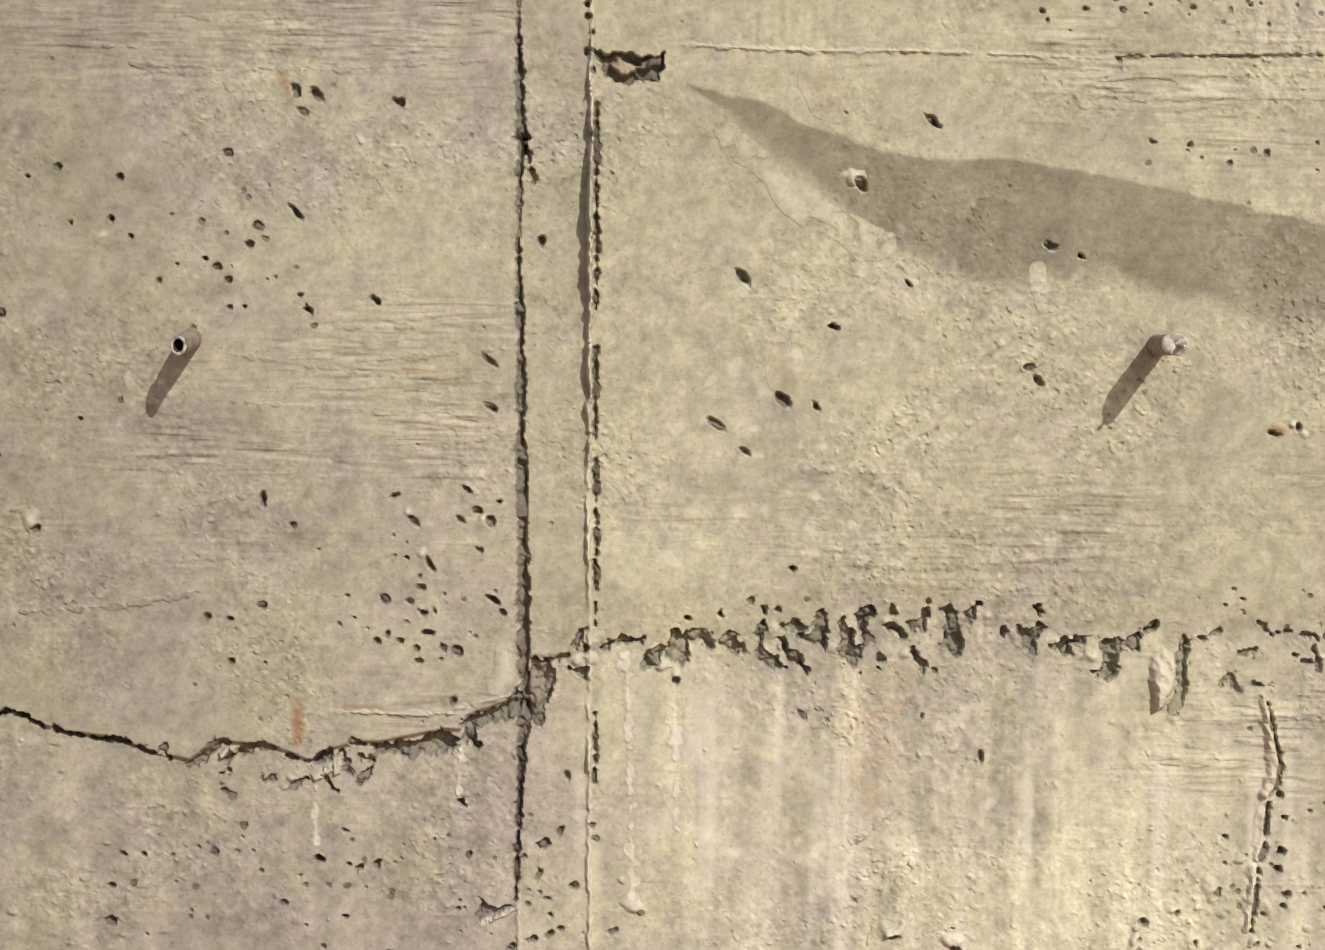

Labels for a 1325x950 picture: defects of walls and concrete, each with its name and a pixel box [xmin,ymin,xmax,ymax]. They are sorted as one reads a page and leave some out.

spalling [583,47,666,440]
spalling [406,515,421,529]
spalling [454,484,497,529]
spalling [373,555,464,666]
spalling [1216,618,1325,698]
spalling [156,595,1223,802]
crack [0,706,158,756]
spalling [534,825,566,851]
spalling [587,821,600,844]
spalling [506,868,586,950]
spalling [605,926,619,937]